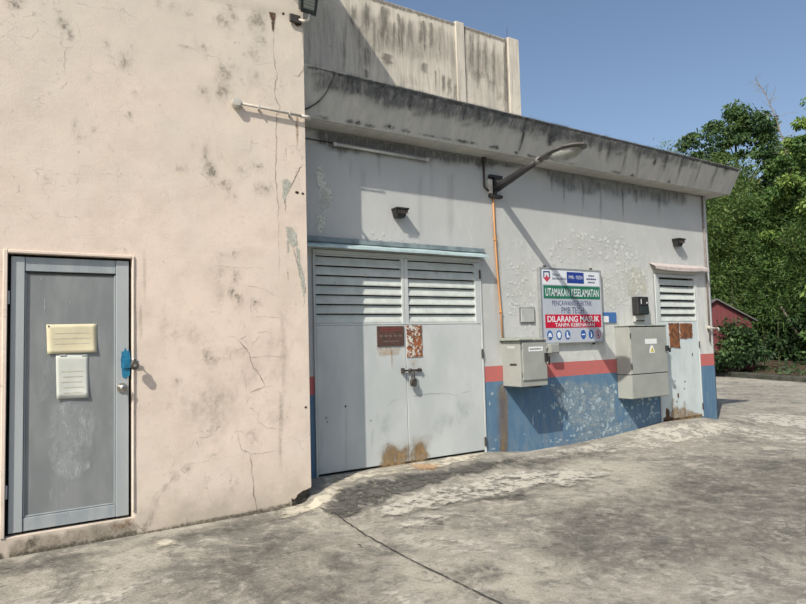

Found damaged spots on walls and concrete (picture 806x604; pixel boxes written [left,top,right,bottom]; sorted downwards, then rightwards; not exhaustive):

damp [365,0,507,101]
damp [311,60,739,172]
peeling [282,179,304,202]
peeling [286,227,306,296]
peeling [542,381,660,443]
corrosion [671,407,702,420]
corrosion [382,443,436,469]
damp [324,453,605,554]